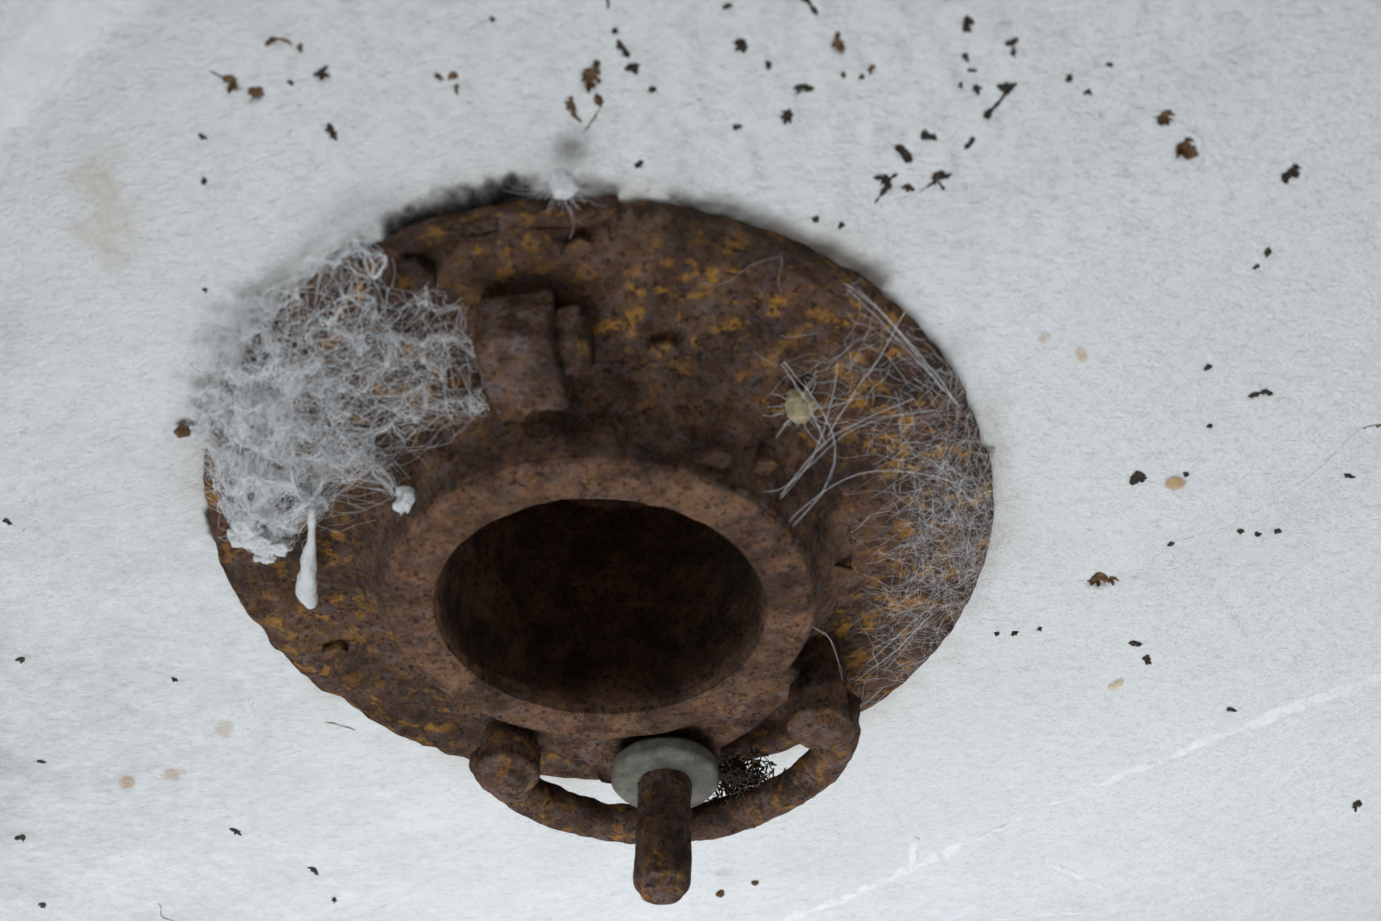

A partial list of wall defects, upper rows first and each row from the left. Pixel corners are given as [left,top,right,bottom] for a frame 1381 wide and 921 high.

rust [560,235,591,264]
rust [389,256,438,294]
rust [647,340,678,360]
rust [292,391,326,414]